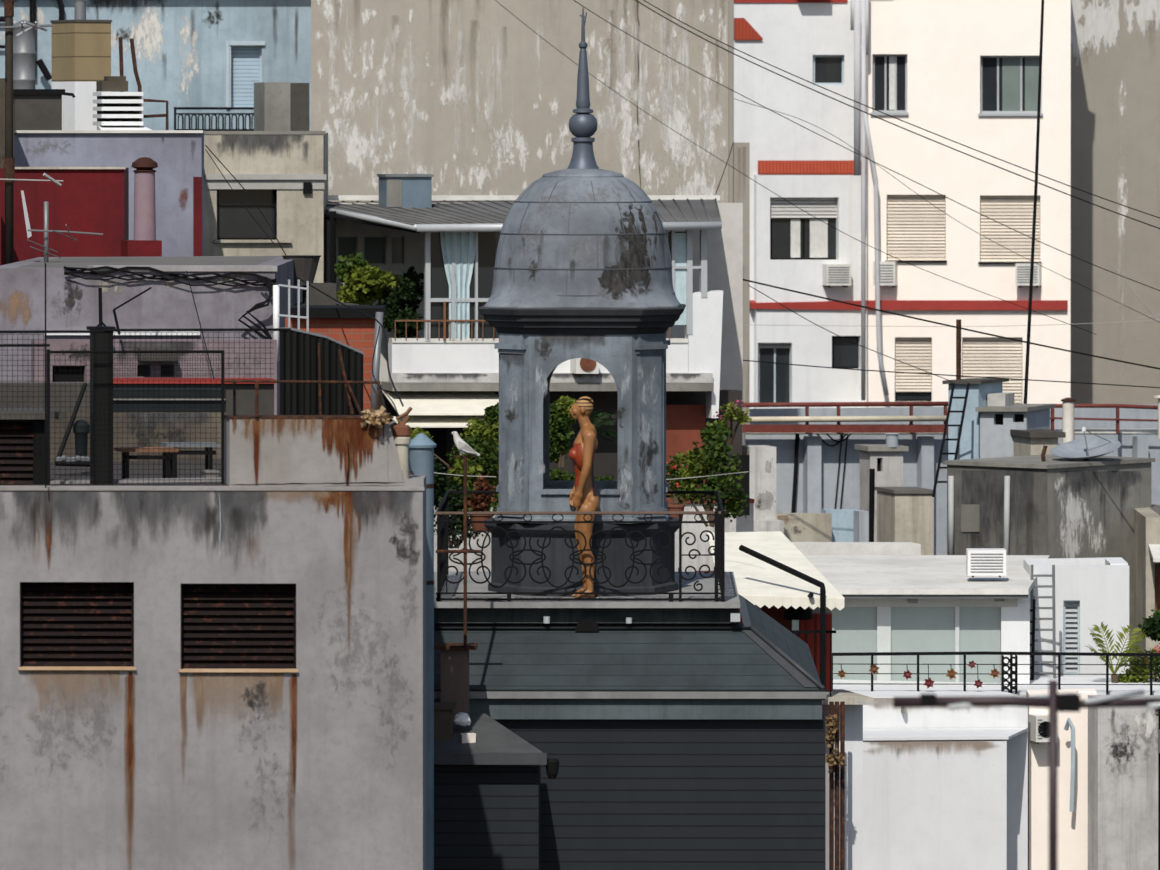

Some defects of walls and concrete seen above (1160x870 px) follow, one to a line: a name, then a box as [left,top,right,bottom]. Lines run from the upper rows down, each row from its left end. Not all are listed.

peeling [1071,0,1160,67]
peeling [316,0,571,201]
peeling [586,3,727,203]
leakage [598,205,664,299]
corrosion [37,510,52,562]
leakage [14,491,98,527]
leakage [114,491,265,540]
corrosion [232,419,385,619]
leakage [353,491,419,562]
corrosion [29,670,134,837]
corrosion [181,672,297,788]